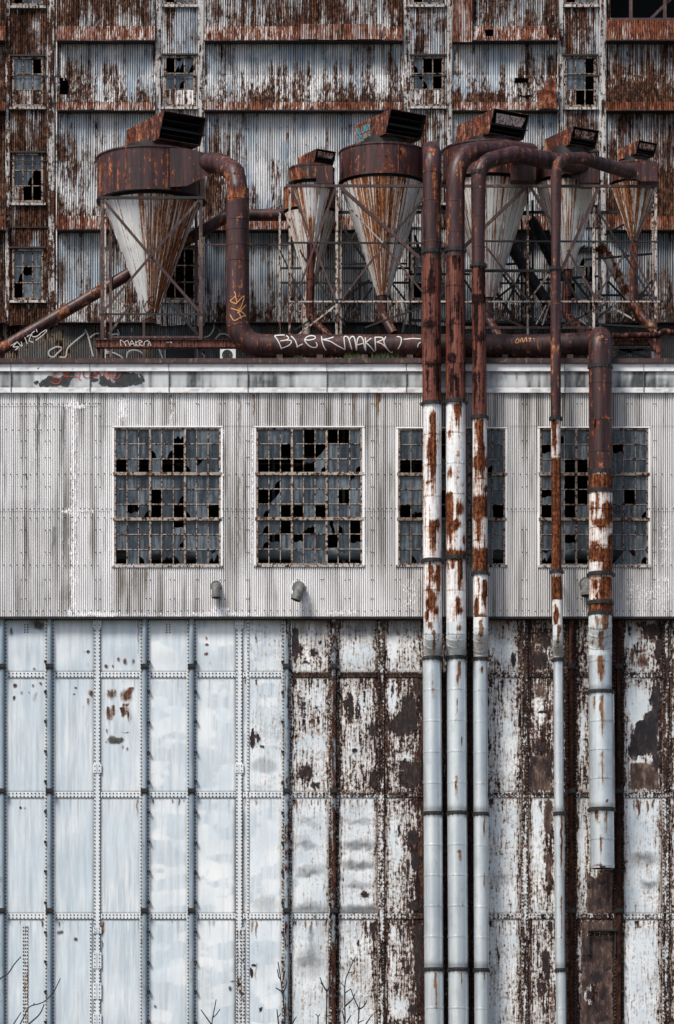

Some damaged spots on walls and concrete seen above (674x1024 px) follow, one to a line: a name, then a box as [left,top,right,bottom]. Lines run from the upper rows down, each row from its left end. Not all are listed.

corrosion [106,687,134,720]
spalling [343,678,422,741]
spalling [628,686,661,790]
spalling [390,758,423,791]